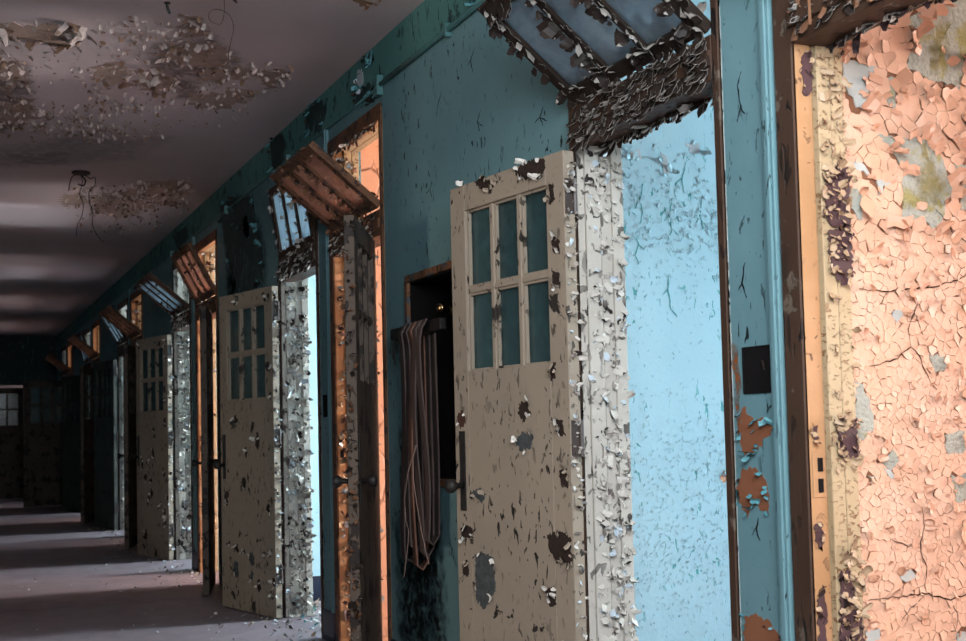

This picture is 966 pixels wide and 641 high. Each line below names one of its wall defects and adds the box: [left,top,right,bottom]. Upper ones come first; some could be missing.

peeling [0,13,294,144]
peeling [56,98,379,641]
peeling [456,0,781,641]
flaking render [929,353,950,375]
flaking render [810,381,901,485]
flaking render [944,430,966,455]
flaking render [951,473,966,513]
peeling [816,525,887,641]
flaking render [900,568,916,584]